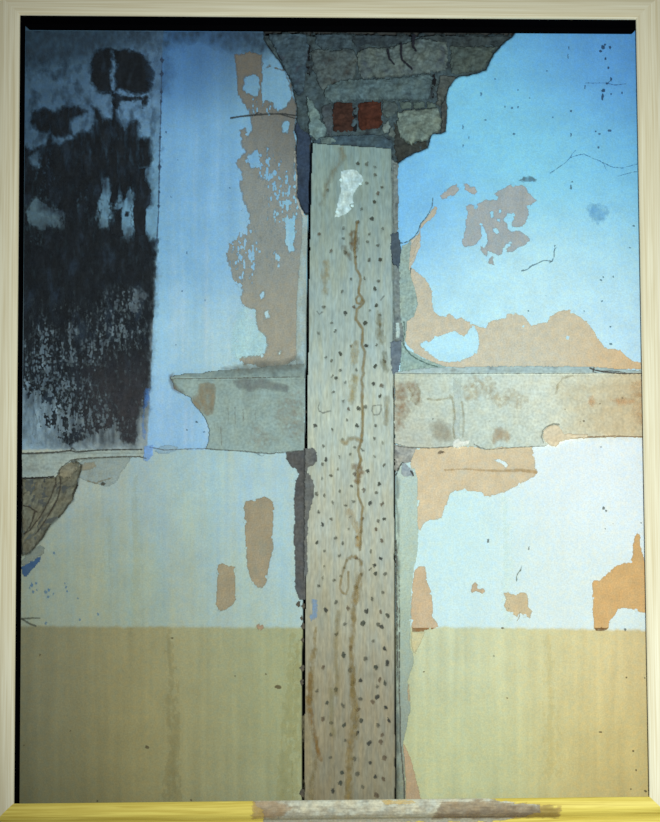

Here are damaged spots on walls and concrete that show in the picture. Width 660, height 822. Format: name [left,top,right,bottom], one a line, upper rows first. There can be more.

leakage [26,31,151,61]
flaking render [226,32,512,368]
peeling [440,182,536,265]
peeling [396,207,641,369]
corrosion [350,222,365,565]
flaking render [21,461,82,576]
peeling [216,563,237,612]
peeling [243,497,275,588]
peeling [409,566,438,653]
peeling [383,445,537,530]
peeling [504,592,532,618]
peeling [592,534,646,631]